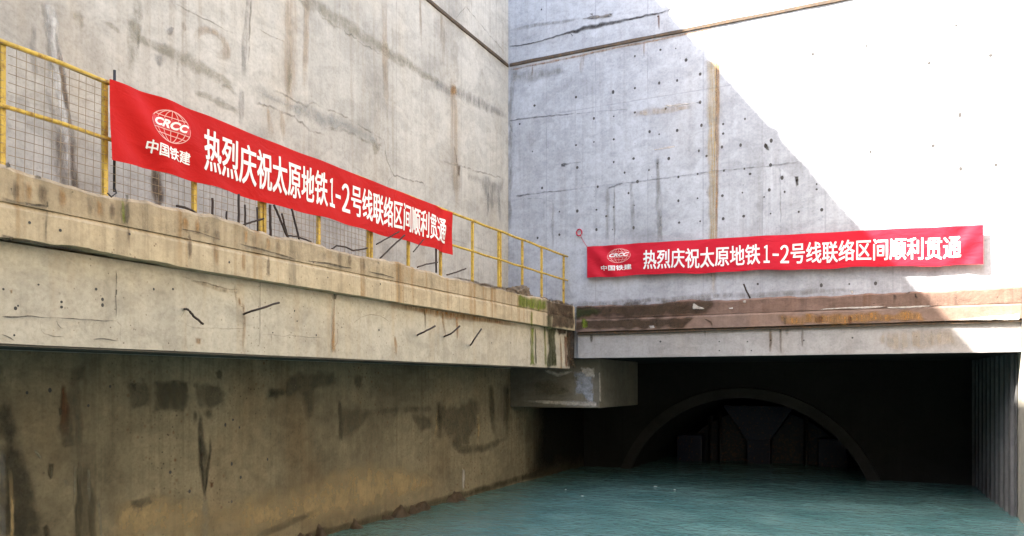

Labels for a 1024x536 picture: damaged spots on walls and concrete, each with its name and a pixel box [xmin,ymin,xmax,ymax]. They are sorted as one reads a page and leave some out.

crack [514,6,672,46]
corrosion [709,61,719,239]
leakage [0,407,49,536]
leakage [129,371,223,494]
leakage [312,402,584,536]